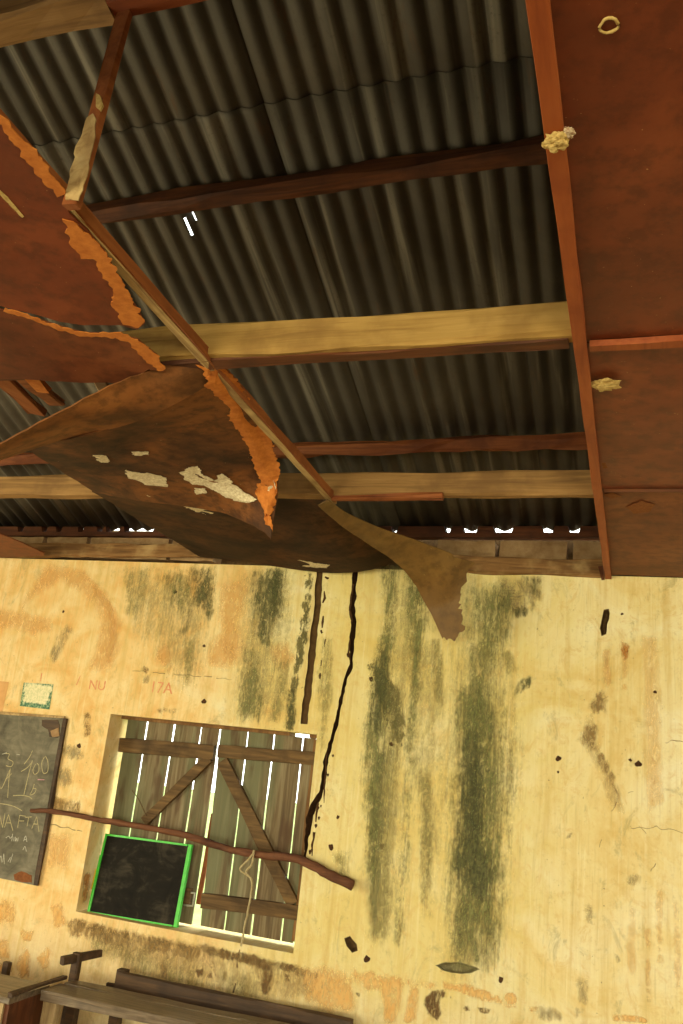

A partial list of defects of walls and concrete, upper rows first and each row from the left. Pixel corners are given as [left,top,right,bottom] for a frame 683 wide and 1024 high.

peeling [65,113,96,201]
peeling [125,470,168,497]
peeling [179,466,256,503]
water stain [213,568,313,730]
crack [304,572,358,857]
water stain [365,566,425,934]
water stain [420,777,431,876]
water stain [450,585,512,961]